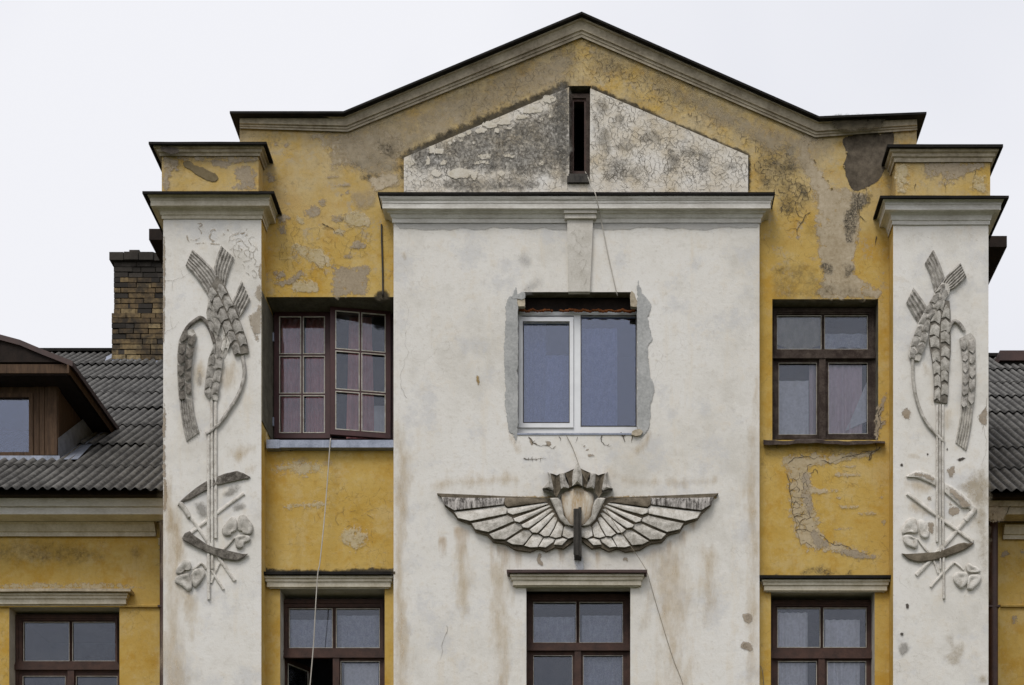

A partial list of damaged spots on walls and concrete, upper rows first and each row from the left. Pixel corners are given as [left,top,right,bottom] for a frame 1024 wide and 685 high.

peeling [162,156,275,191]
peeling [368,173,398,191]
leakage [413,86,572,192]
crack [407,38,811,231]
peeling [796,132,894,299]
peeling [331,240,370,298]
peeling [782,393,887,560]